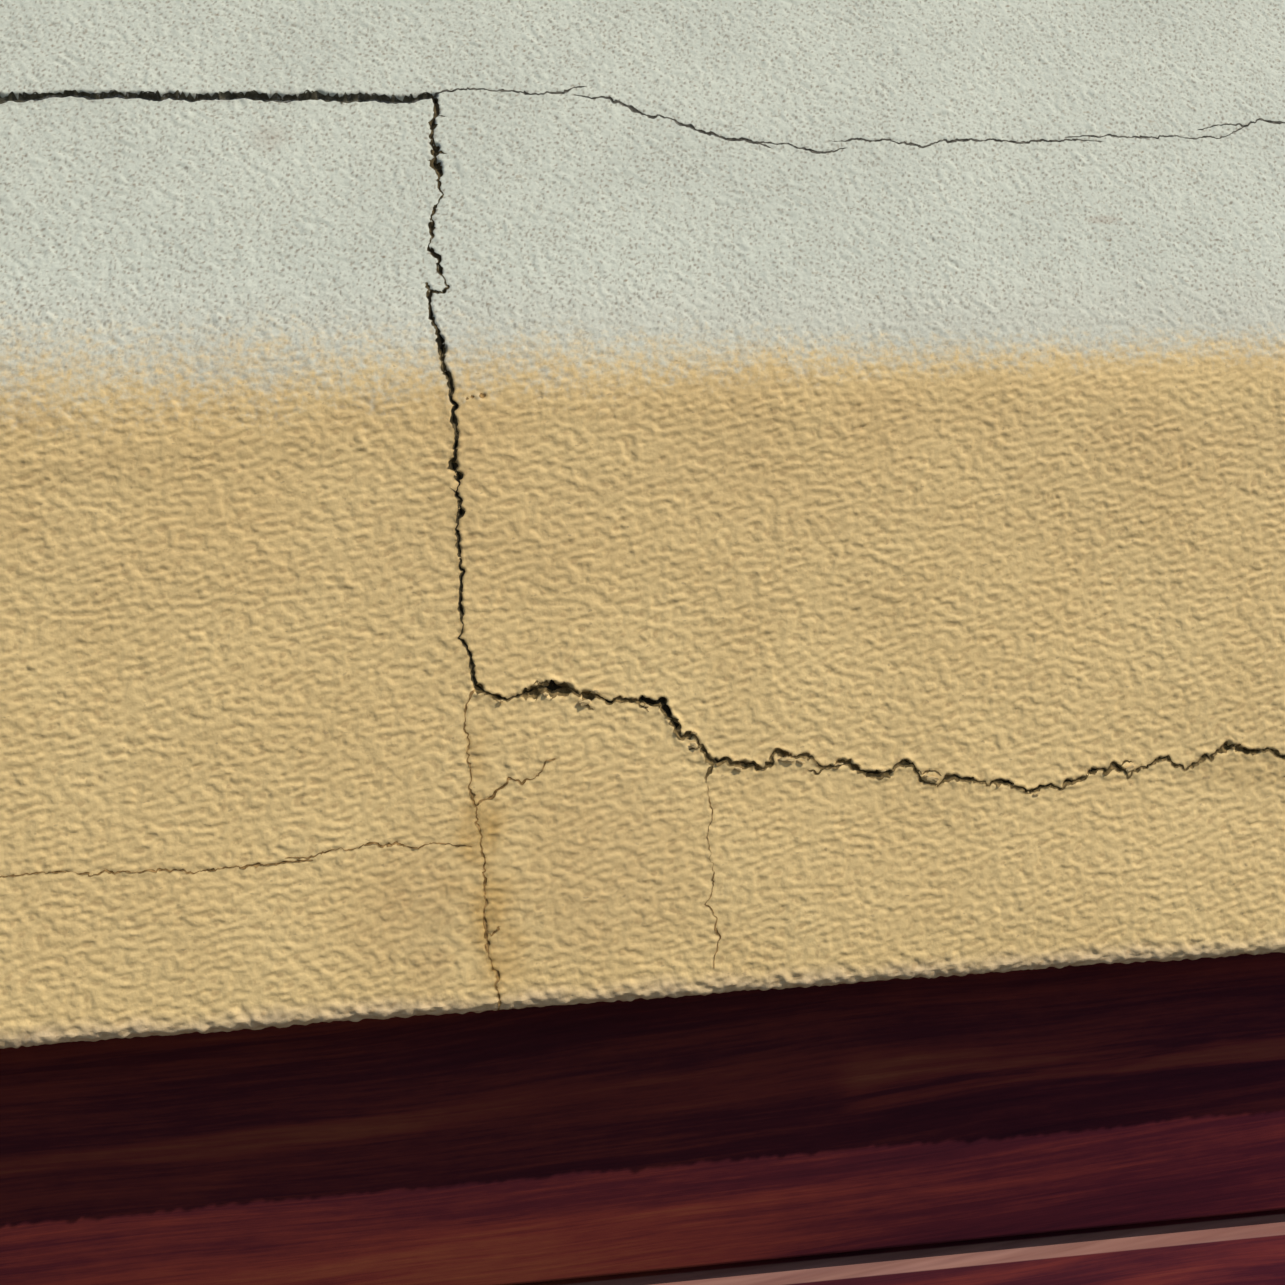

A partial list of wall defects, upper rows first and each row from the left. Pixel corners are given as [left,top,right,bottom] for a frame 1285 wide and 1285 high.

crack [0,86,1285,1011]